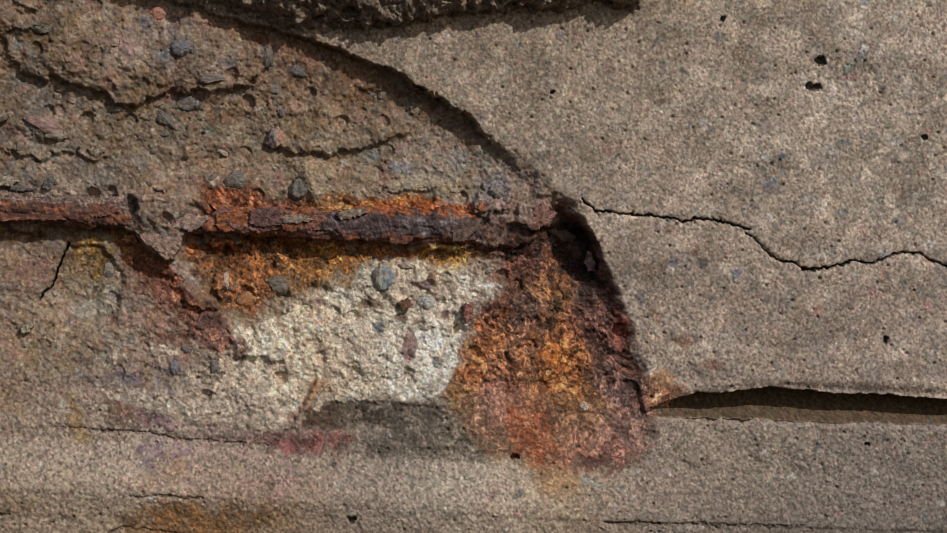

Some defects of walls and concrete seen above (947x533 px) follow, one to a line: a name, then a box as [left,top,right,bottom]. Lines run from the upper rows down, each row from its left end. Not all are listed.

crack [40,242,70,300]
spalling [0,0,606,430]
rust [71,183,680,494]
crack [581,198,947,272]